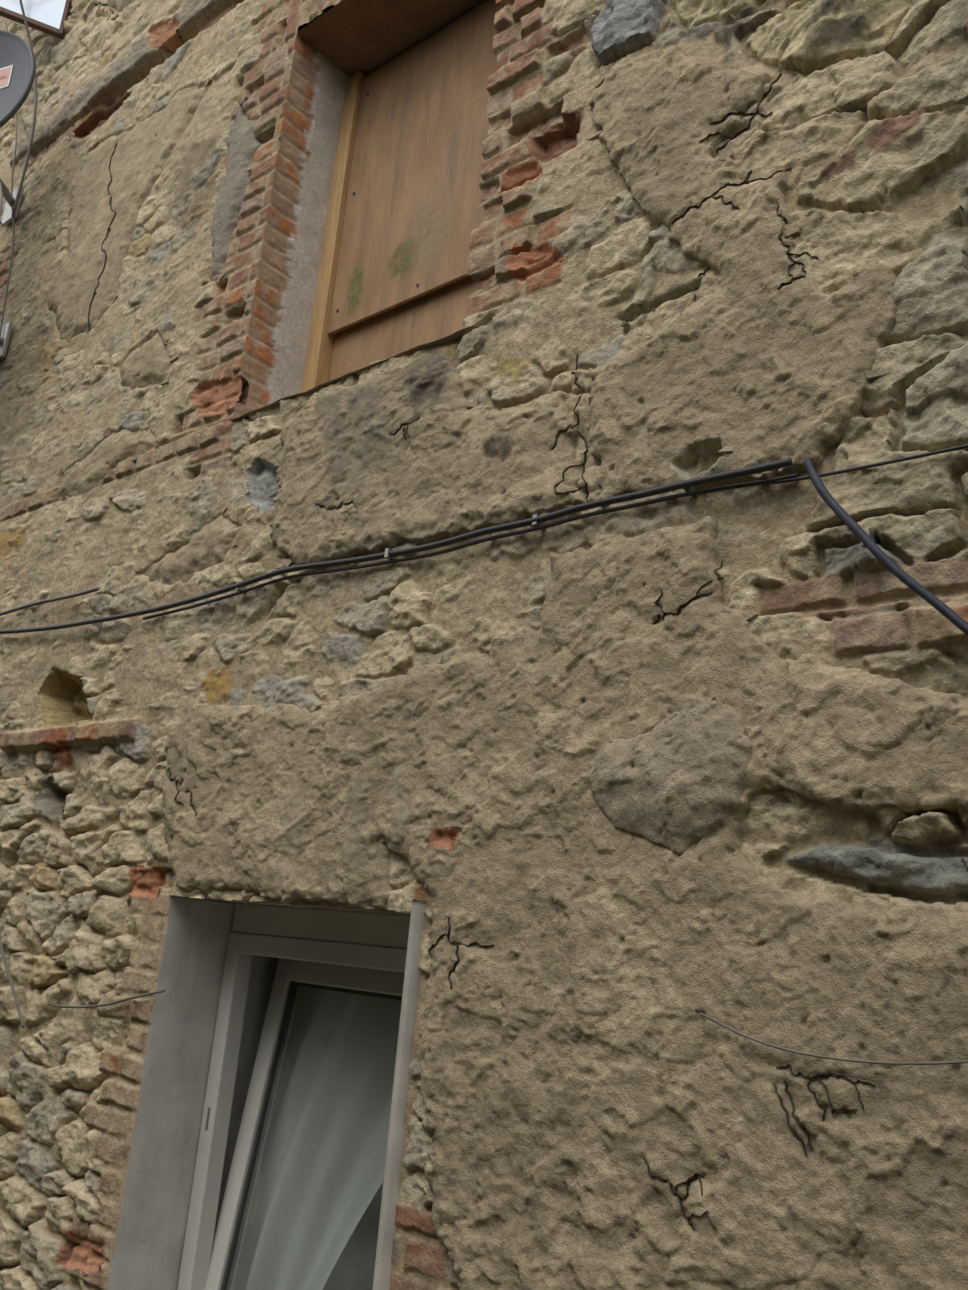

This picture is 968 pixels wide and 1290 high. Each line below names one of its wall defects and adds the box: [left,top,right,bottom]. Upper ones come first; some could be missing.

crack [699,73,782,151]
crack [672,168,819,290]
spalling [38,666,92,729]
spalling [34,775,71,822]
crack [772,1064,875,1157]
spalling [55,1230,106,1275]